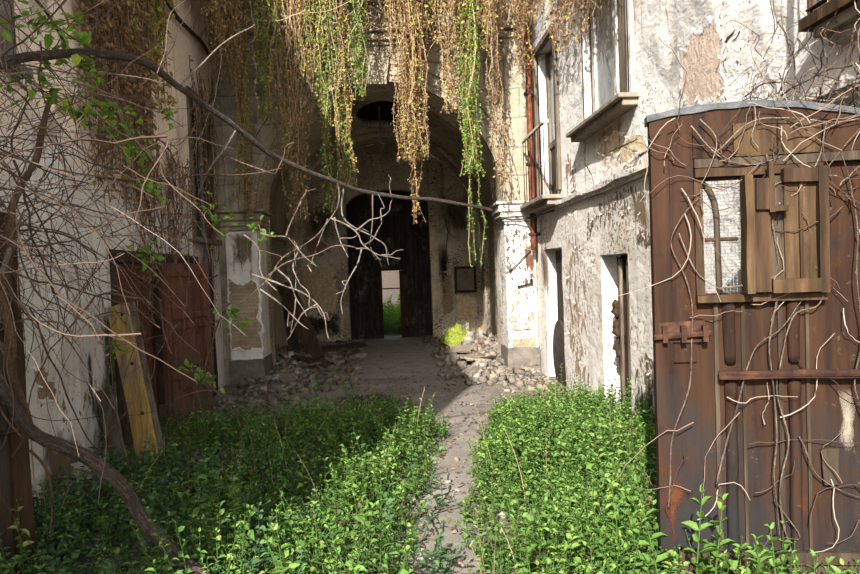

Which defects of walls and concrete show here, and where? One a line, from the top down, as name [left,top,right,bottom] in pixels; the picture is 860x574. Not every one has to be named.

flaking render [678,10,729,107]
peeling [566,154,576,215]
flaking render [592,125,648,176]
peeling [637,228,650,247]
flaking render [226,277,265,353]
flaking render [505,229,539,348]
peeling [566,183,646,385]
peeling [635,353,654,406]